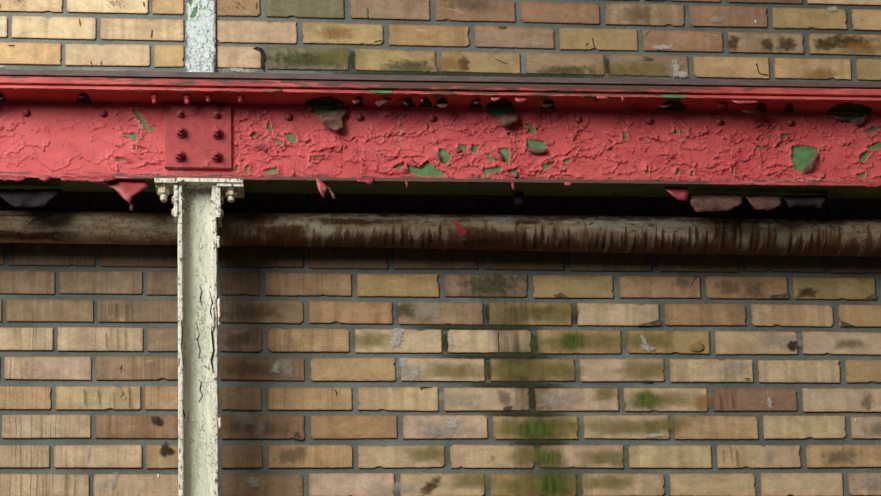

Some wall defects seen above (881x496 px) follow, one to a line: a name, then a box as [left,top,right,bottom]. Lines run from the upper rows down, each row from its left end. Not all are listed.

peeling [304,90,449,131]
peeling [469,97,571,170]
peeling [781,134,819,173]
peeling [0,175,148,211]
peeling [394,145,524,205]
peeling [664,188,828,212]
corrosion [243,215,303,239]
corrosion [320,218,441,248]
corrosion [462,220,570,249]
corrosion [588,222,777,252]
crack [181,287,215,418]
damp [390,305,562,416]